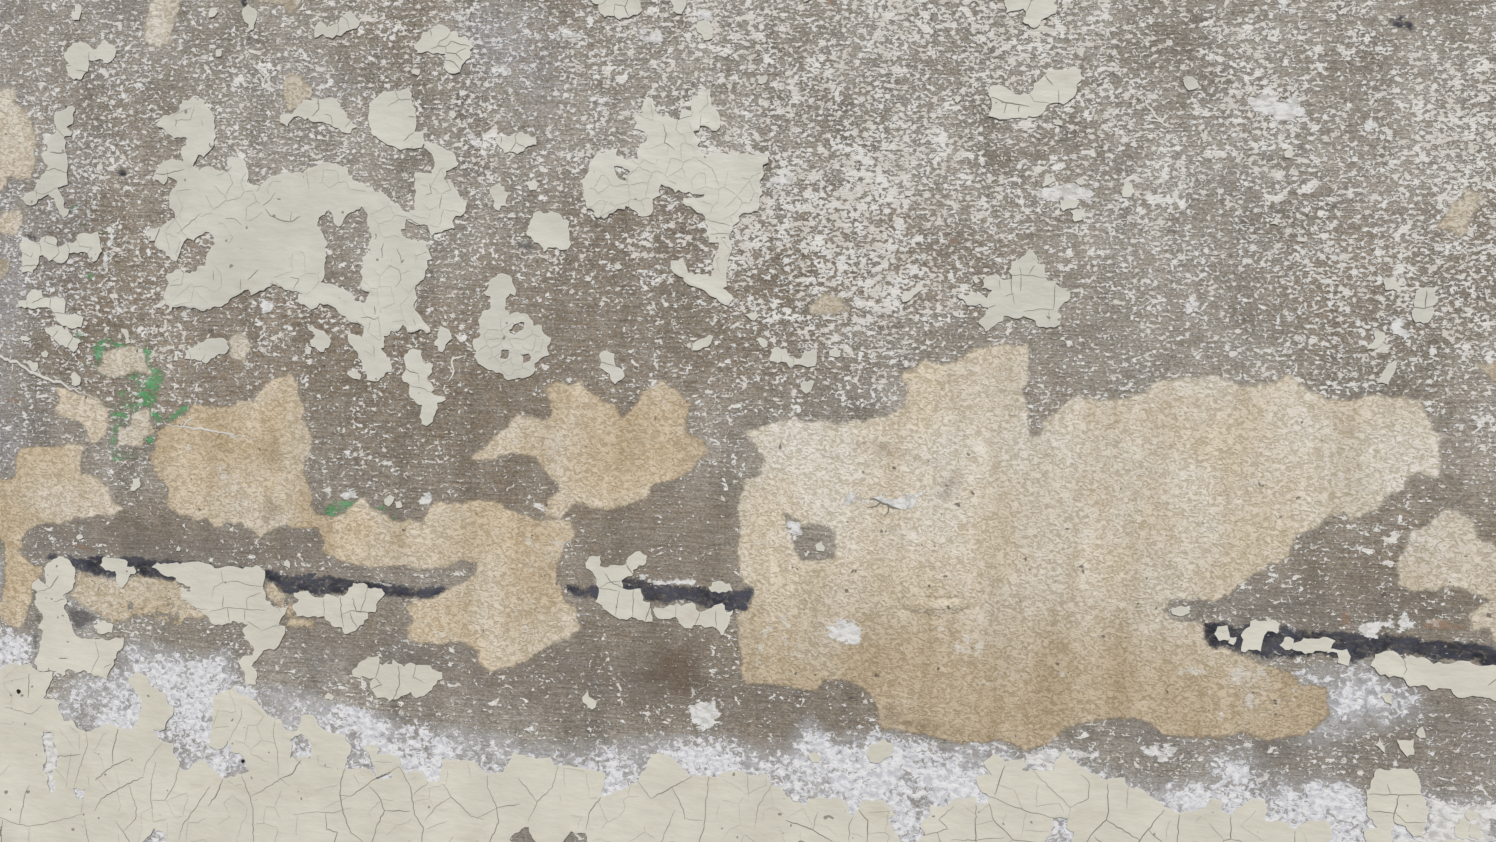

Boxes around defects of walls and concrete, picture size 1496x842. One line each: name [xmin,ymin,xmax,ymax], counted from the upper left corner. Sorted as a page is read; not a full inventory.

peeling [145,24,473,426]
leakage [0,619,41,669]
leakage [70,610,94,628]
flaking render [0,249,1444,842]
leakage [55,640,1477,842]
leakage [1204,622,1496,732]
peeling [1371,651,1496,704]
flaking render [1396,509,1496,642]